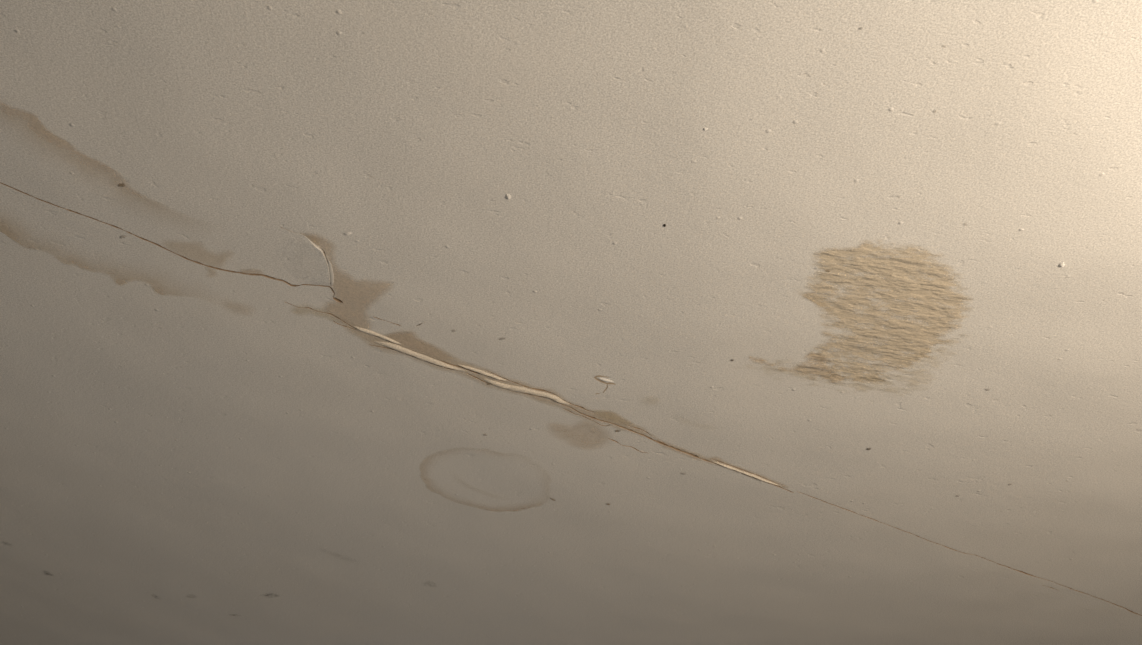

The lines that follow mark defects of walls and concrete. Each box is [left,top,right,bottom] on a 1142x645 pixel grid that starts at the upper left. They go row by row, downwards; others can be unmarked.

crack [0,182,1142,616]
leakage [812,244,966,382]